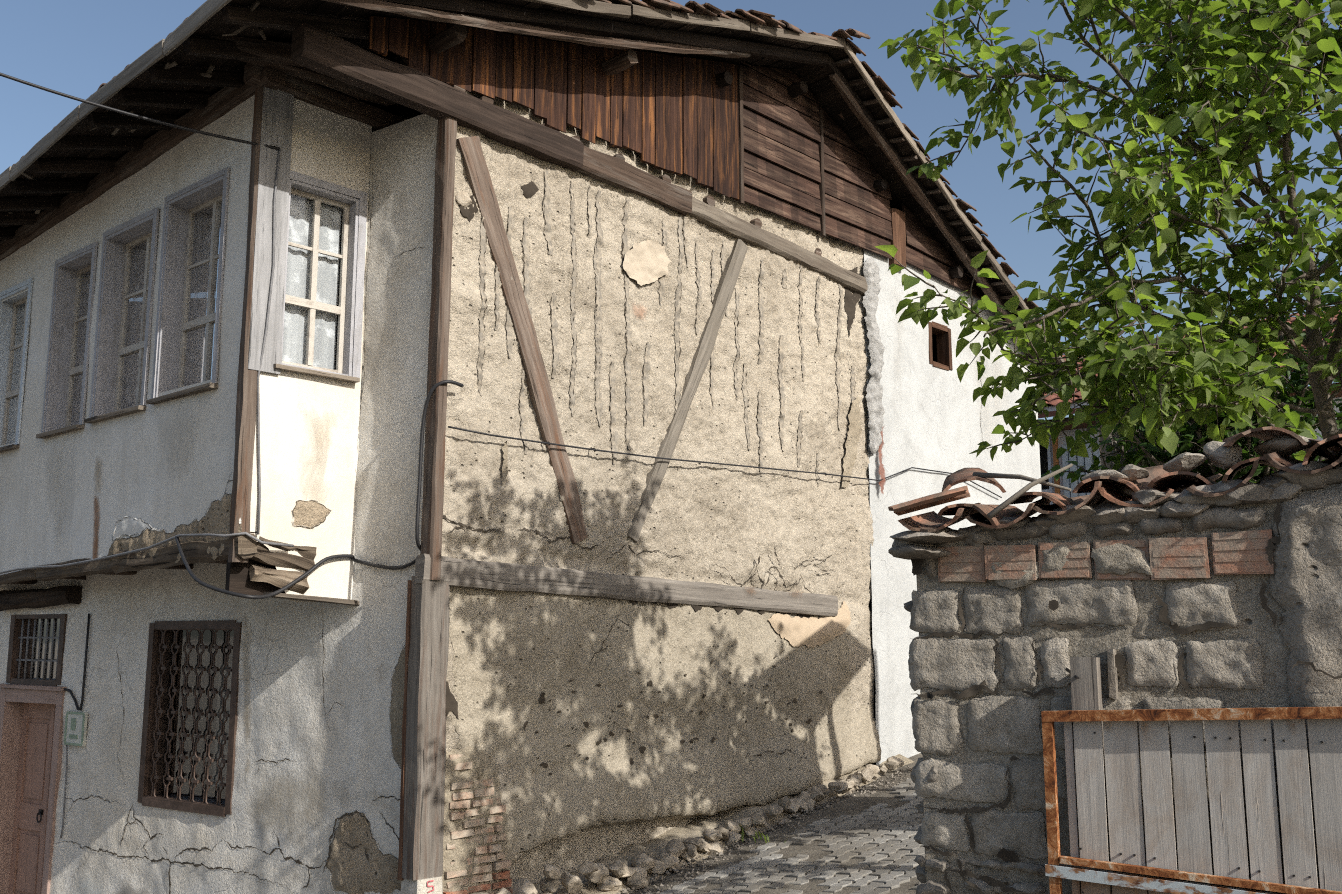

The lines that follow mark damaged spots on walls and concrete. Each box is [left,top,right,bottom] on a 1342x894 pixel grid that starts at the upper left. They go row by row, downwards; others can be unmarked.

leakage [842,397,862,488]
flaking render [107,493,286,595]
flaking render [292,500,331,528]
crack [54,642,400,894]
flaking render [326,809,402,894]
flaking render [443,754,522,894]